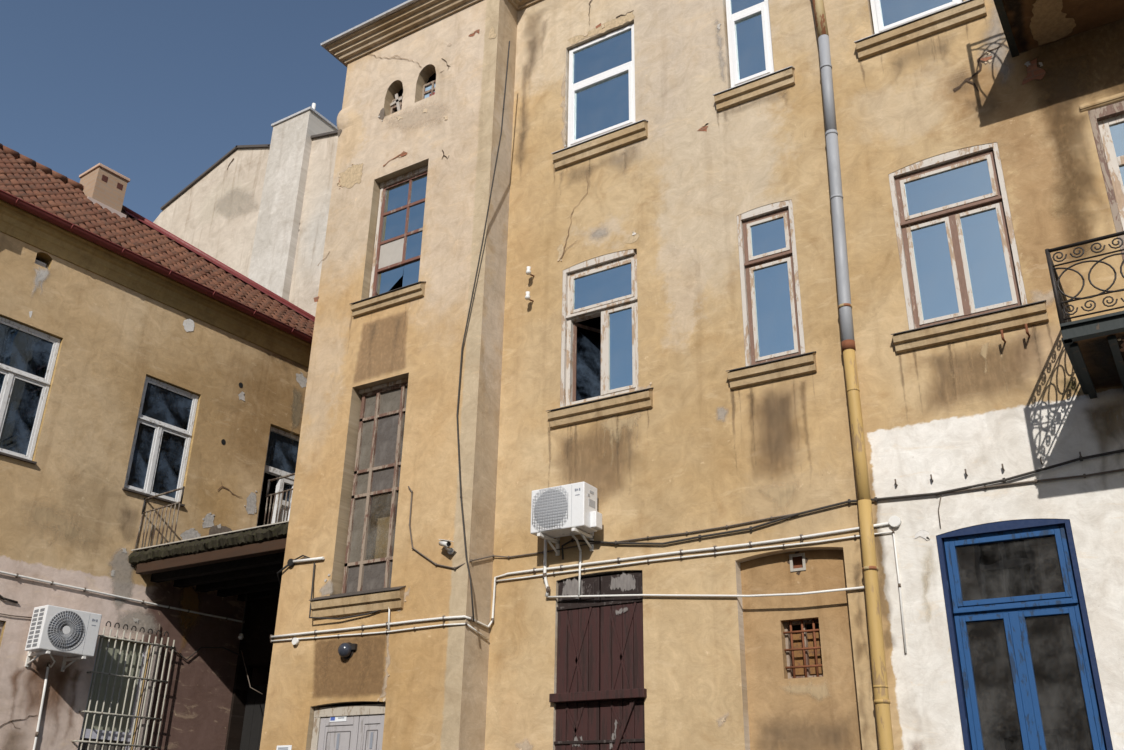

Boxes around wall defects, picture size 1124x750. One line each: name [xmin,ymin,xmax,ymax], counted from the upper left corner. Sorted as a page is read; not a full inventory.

crack [953,45,1002,92]
flaking render [1021,0,1076,85]
water stain [1005,0,1124,252]
crack [560,175,588,259]
water stain [568,414,639,490]